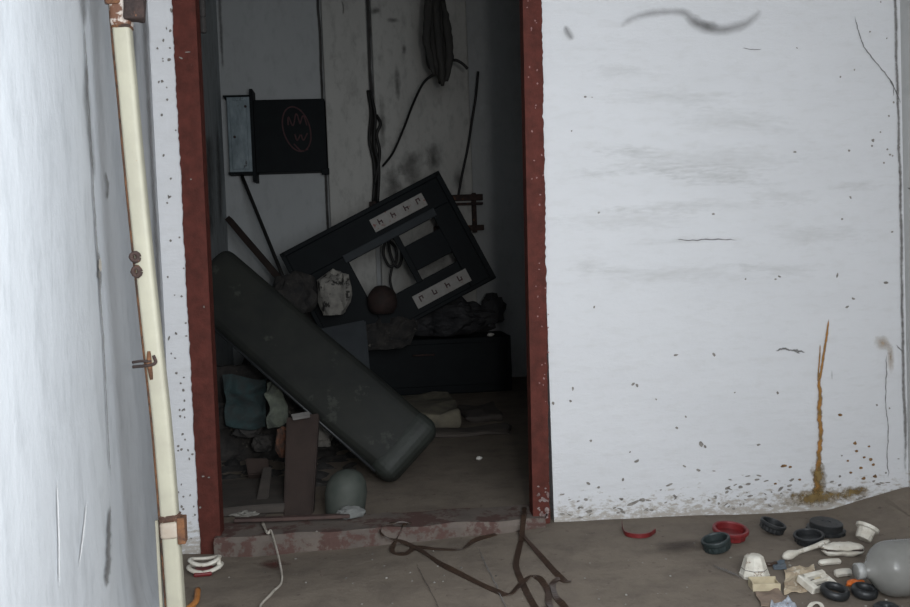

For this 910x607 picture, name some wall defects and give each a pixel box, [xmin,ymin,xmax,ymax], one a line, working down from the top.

crack [855,0,910,471]
corrosion [791,321,877,505]
peeling [537,486,592,519]
flaking render [613,498,653,514]
flaking render [708,475,768,510]